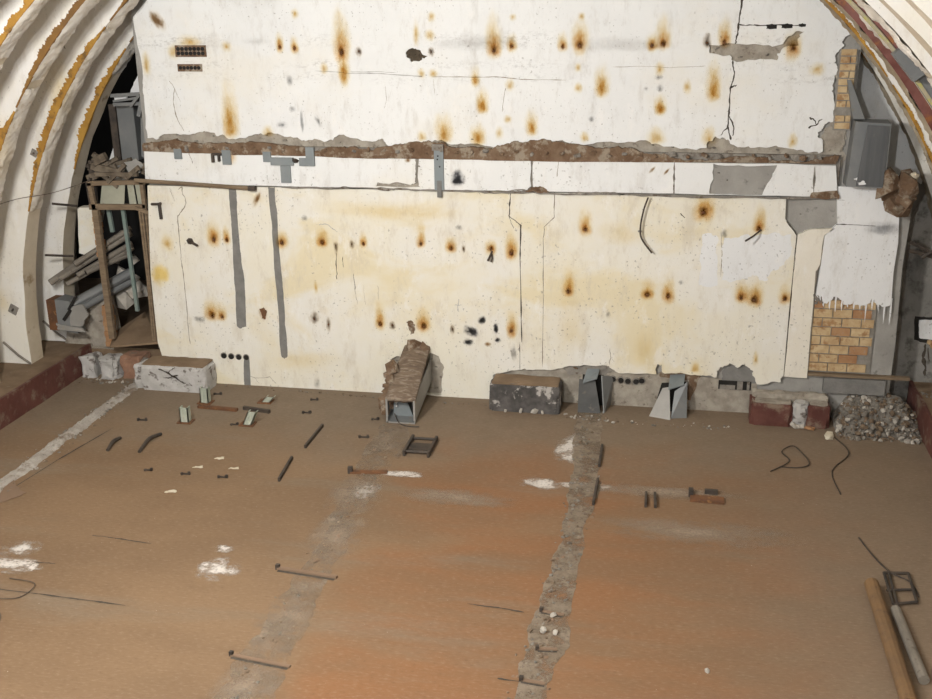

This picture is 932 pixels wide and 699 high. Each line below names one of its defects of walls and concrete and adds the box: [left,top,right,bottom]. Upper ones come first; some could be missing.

spalling [587,0,932,167]
crack [721,0,799,140]
spalling [146,131,401,147]
spalling [434,139,501,149]
corrosion [142,138,840,164]
spalling [709,164,777,196]
spalling [785,191,840,234]
spalling [914,316,932,349]
spalling [722,365,756,384]
flaking render [790,297,877,429]